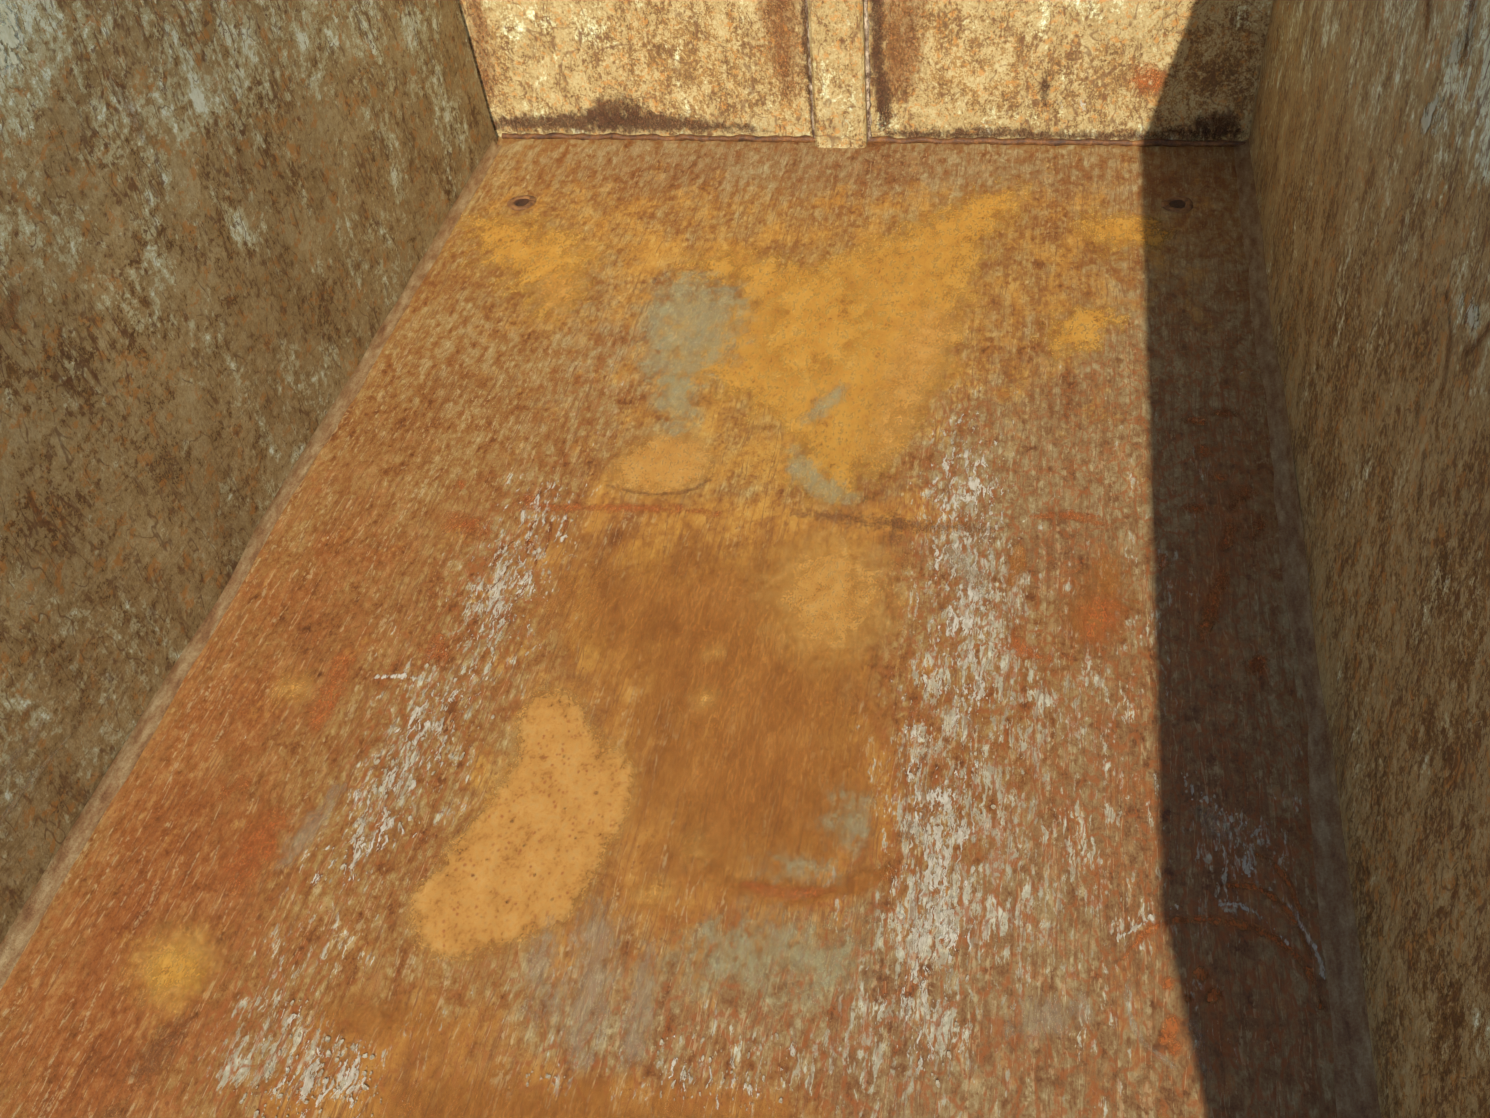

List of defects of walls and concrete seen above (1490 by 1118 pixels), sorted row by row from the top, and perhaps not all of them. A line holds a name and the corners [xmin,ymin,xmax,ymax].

rust [869,0,926,130]
rust [463,215,589,316]
rust [1081,214,1169,251]
rust [682,189,1029,541]
rust [1049,306,1125,359]
rust [528,435,720,517]
rust [780,546,879,648]
peeling [303,479,587,889]
peeling [875,411,1028,1088]
rust [409,690,636,960]
rust [145,936,202,991]